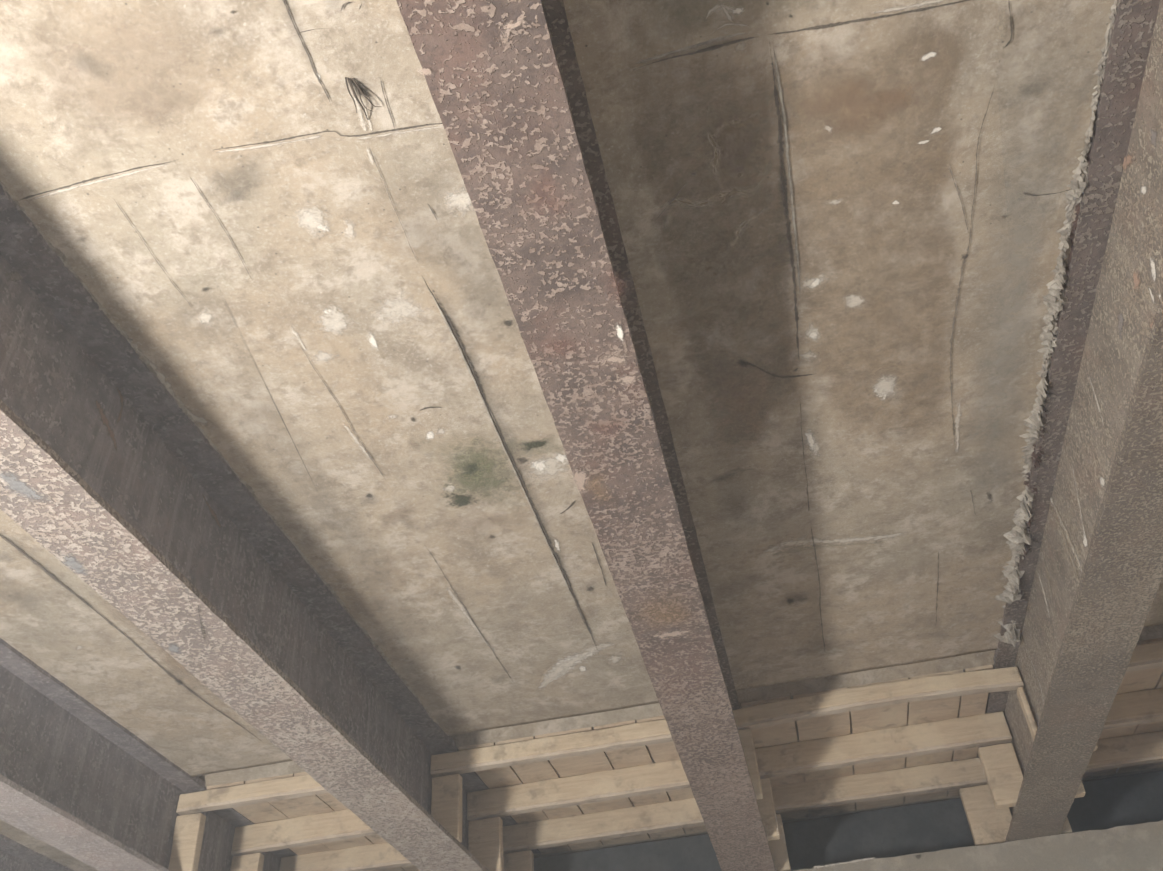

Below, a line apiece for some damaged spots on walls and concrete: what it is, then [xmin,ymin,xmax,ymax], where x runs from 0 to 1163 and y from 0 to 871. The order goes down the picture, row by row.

crack [283,0,329,99]
crack [192,180,249,274]
crack [292,330,383,475]
crack [0,534,256,737]
crack [429,551,511,678]